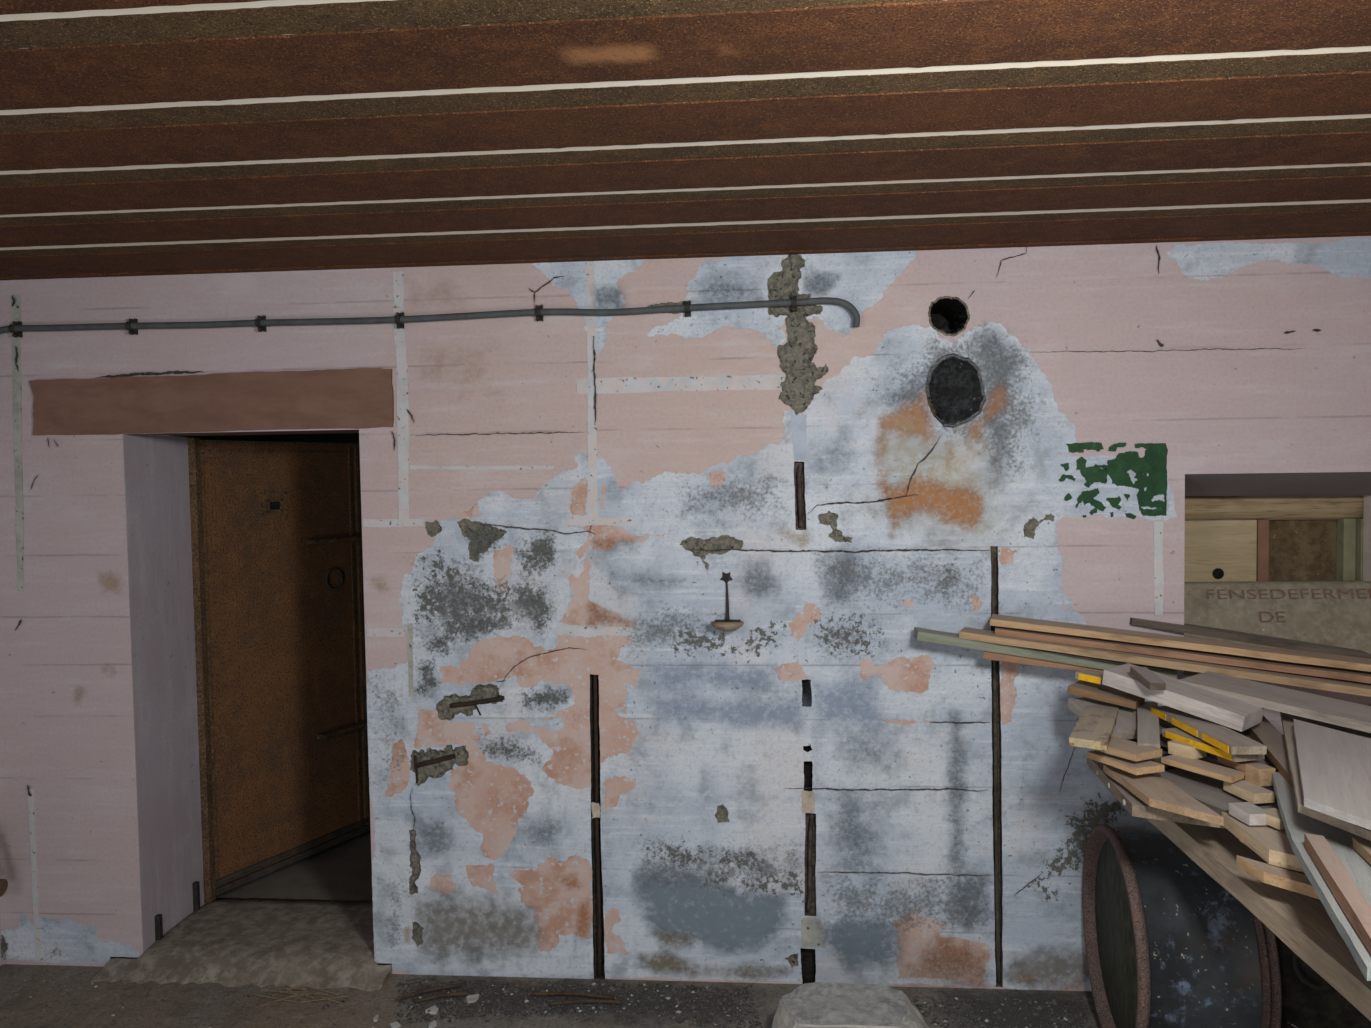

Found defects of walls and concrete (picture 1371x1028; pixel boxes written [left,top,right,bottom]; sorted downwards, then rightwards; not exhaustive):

peeling [1166,238,1371,281]
crack [808,436,941,514]
crack [686,547,987,555]
leakage [417,525,556,697]
peeling [366,251,1178,990]
crack [497,647,585,687]
leakage [420,903,532,957]